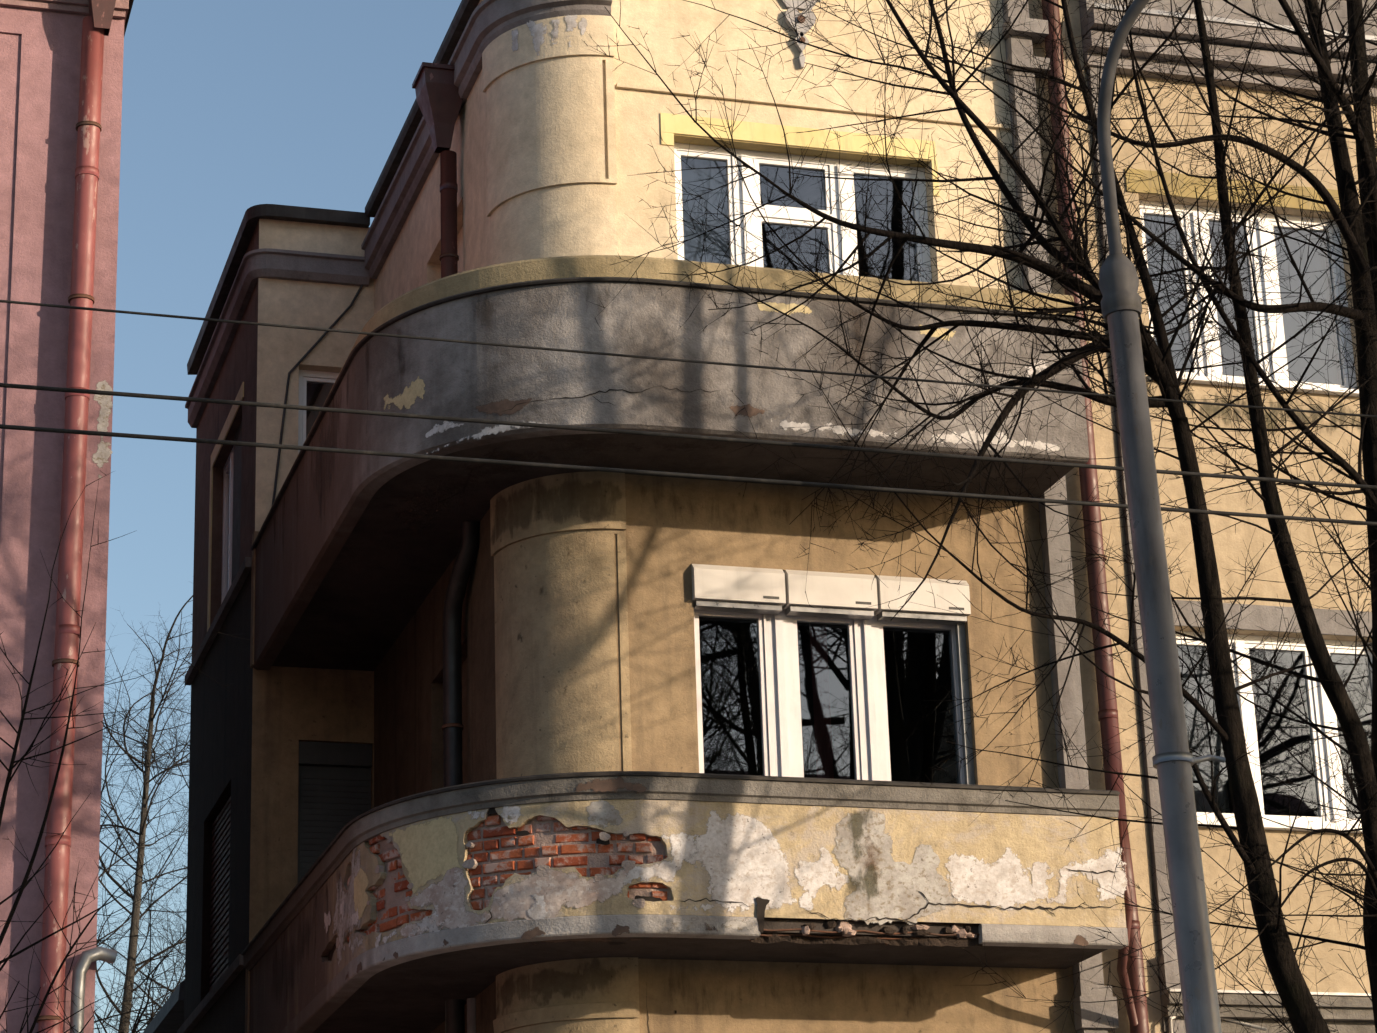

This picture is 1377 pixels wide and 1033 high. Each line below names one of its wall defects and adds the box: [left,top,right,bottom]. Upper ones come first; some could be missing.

peeling [511,15,587,56]
crack [505,386,714,411]
peeling [426,421,463,438]
spalling [324,799,1127,980]